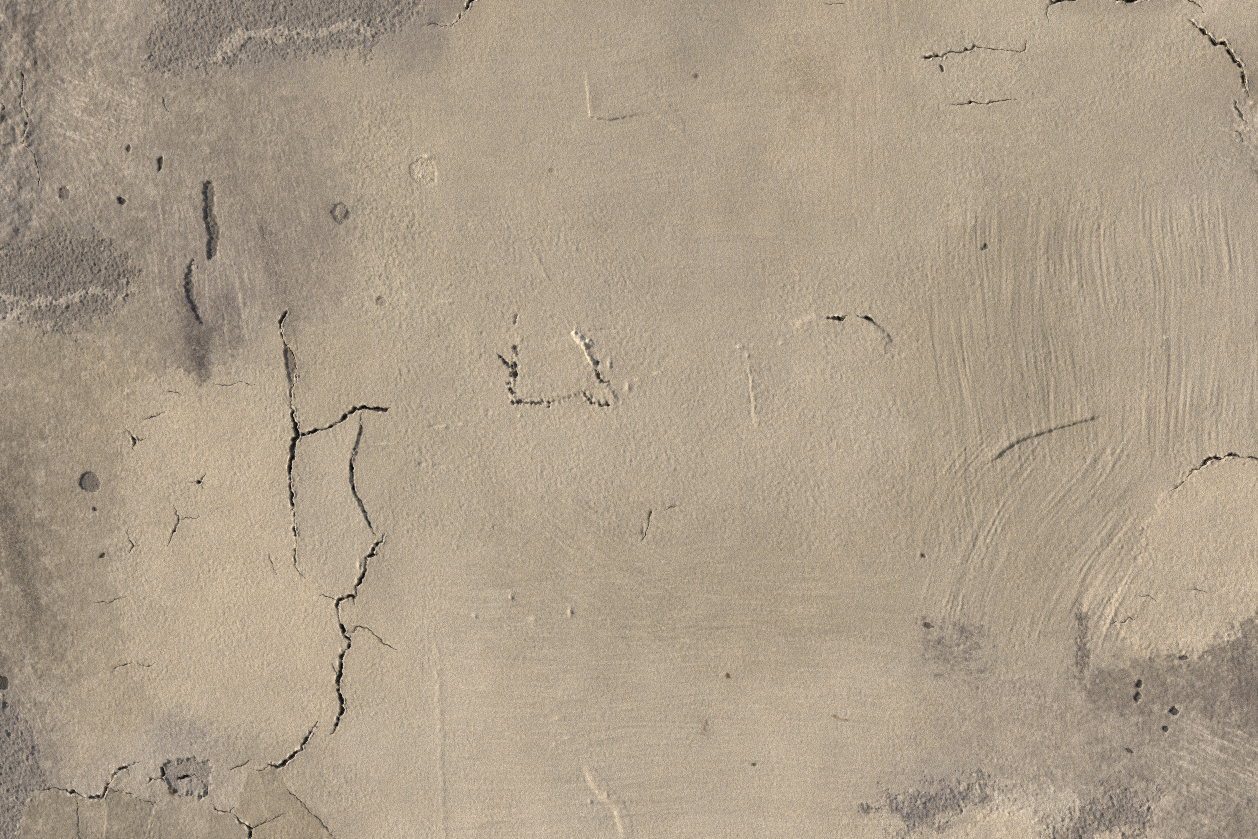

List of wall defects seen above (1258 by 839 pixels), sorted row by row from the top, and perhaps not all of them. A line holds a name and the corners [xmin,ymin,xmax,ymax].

spalling [133,0,427,88]
crack [924,43,1026,62]
crack [952,98,1011,106]
crack [1174,0,1250,136]
spalling [59,186,70,200]
spalling [0,226,145,343]
crack [827,314,874,322]
crack [1174,454,1258,489]
crack [36,308,396,839]
spalling [1073,603,1095,674]
spalling [857,759,1006,839]
spalling [1039,771,1166,839]